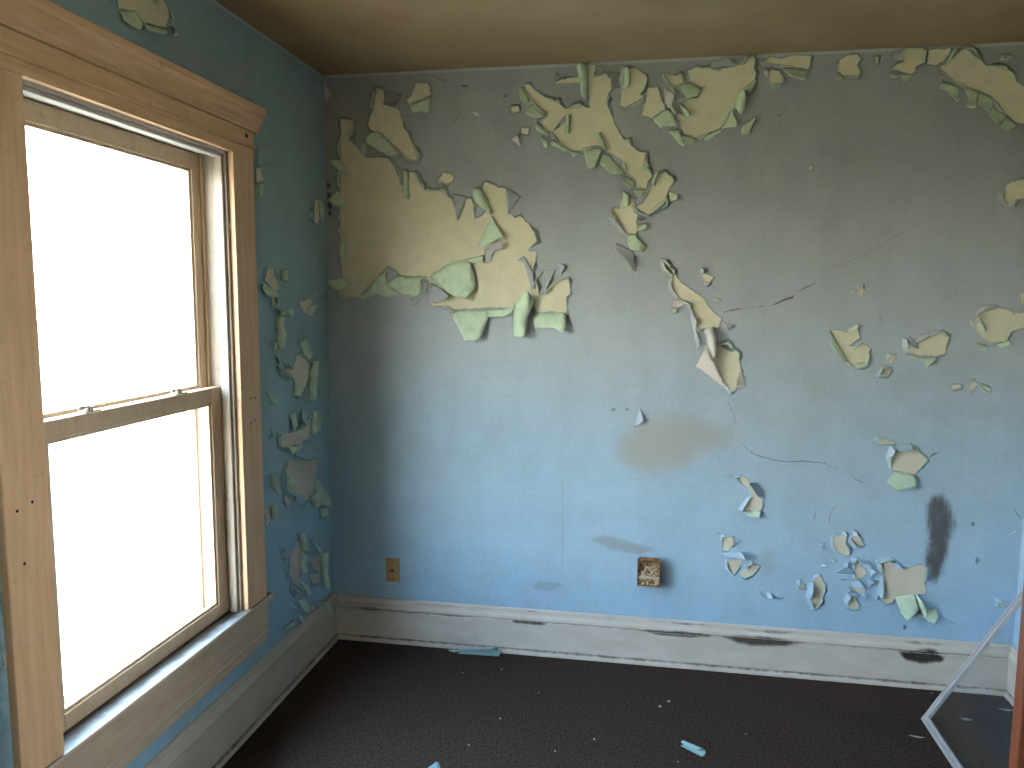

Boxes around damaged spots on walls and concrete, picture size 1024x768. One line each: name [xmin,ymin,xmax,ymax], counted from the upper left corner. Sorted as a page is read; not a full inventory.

peeling [834,44,1024,131]
peeling [509,54,814,271]
peeling [262,81,573,529]
peeling [660,258,747,395]
crack [723,221,923,315]
peeling [829,324,951,378]
water stain [598,398,754,489]
crack [726,400,866,484]
peeling [871,436,930,492]
peeling [719,534,761,580]
peeling [795,530,954,624]
water stain [918,489,976,590]